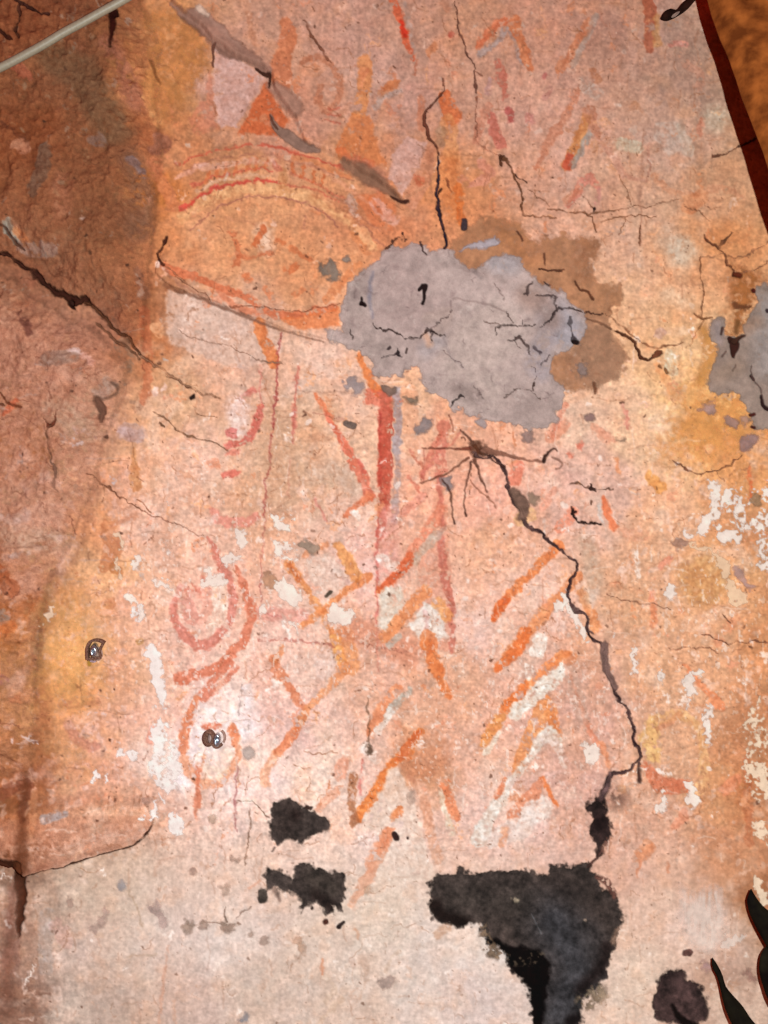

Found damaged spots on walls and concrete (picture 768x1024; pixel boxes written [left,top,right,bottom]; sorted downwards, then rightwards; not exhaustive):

crack [454,1,656,245]
crack [0,225,228,451]
peeling [463,237,500,250]
damp [451,218,627,394]
crack [486,206,767,399]
crack [45,414,57,487]
crack [421,392,643,776]
crack [702,615,767,654]
damp [269,798,330,851]
damp [258,863,346,929]
damp [426,771,624,1024]
damp [652,970,709,1024]